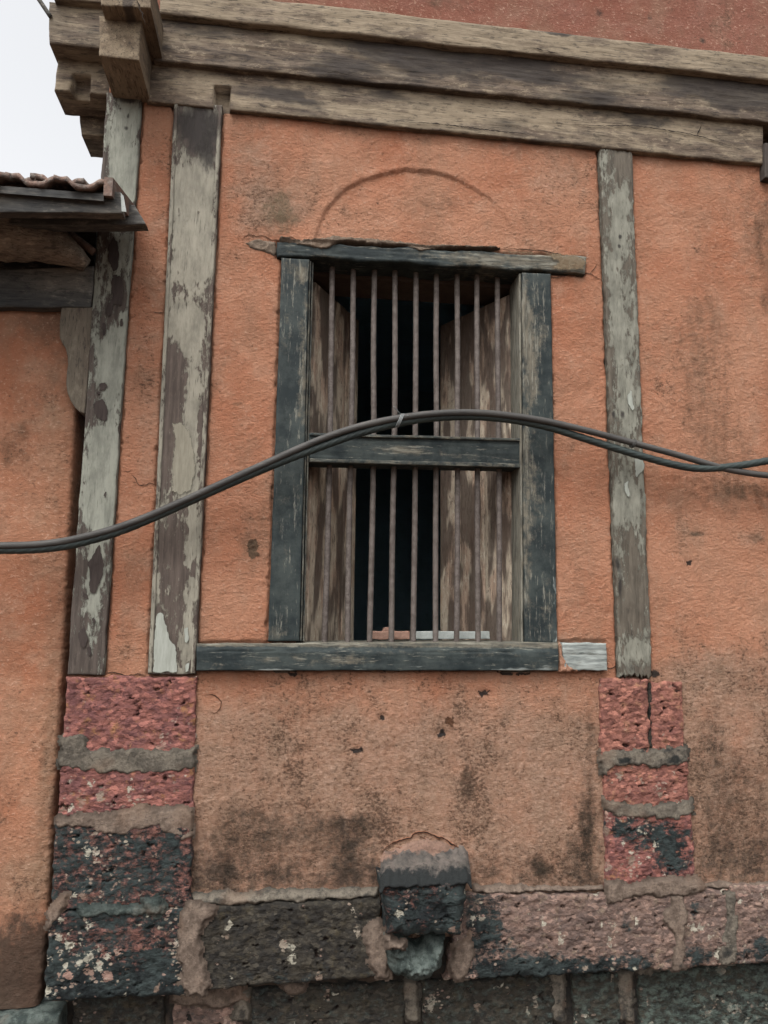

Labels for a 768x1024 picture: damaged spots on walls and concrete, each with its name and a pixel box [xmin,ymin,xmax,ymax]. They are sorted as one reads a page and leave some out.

peeling [93,383,108,421]
peeling [171,422,195,495]
peeling [83,545,104,599]
peeling [78,618,96,656]
peeling [153,613,189,673]